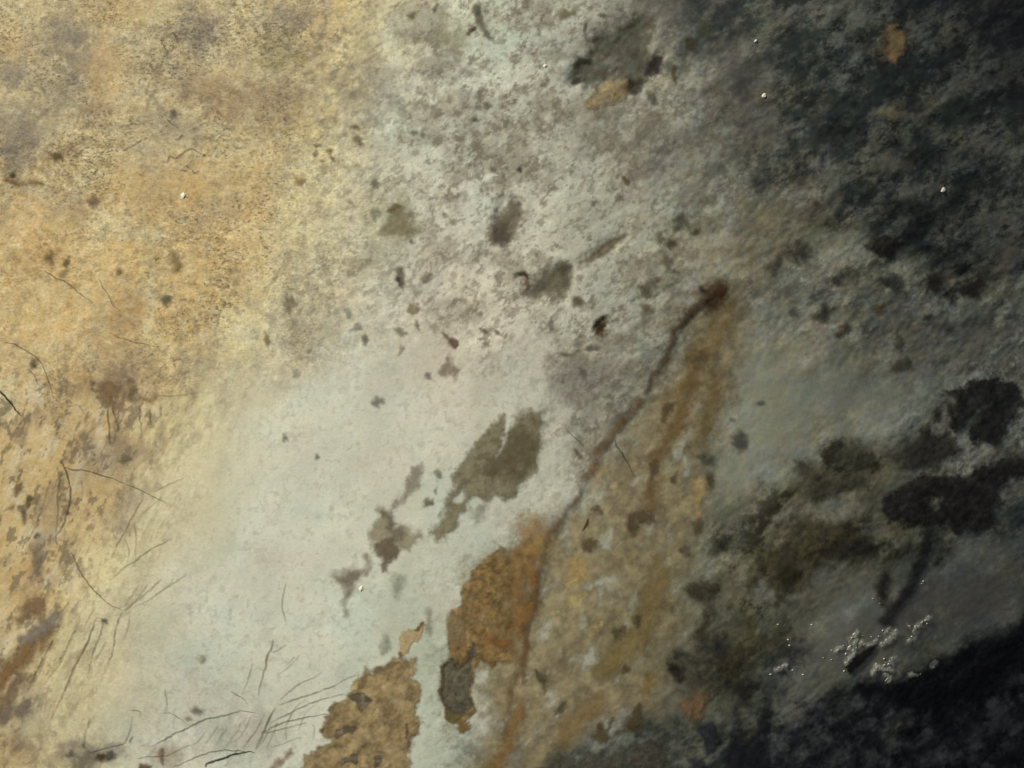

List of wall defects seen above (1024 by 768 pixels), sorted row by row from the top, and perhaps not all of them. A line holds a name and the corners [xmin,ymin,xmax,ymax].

crack [56,461,165,705]
crack [129,589,352,767]
water stain [336,571,367,613]
peeling [303,611,429,768]
water stain [365,412,543,571]
peeling [438,547,517,733]
rust [475,283,743,768]
water stain [691,614,1024,768]
mould [875,378,1024,625]